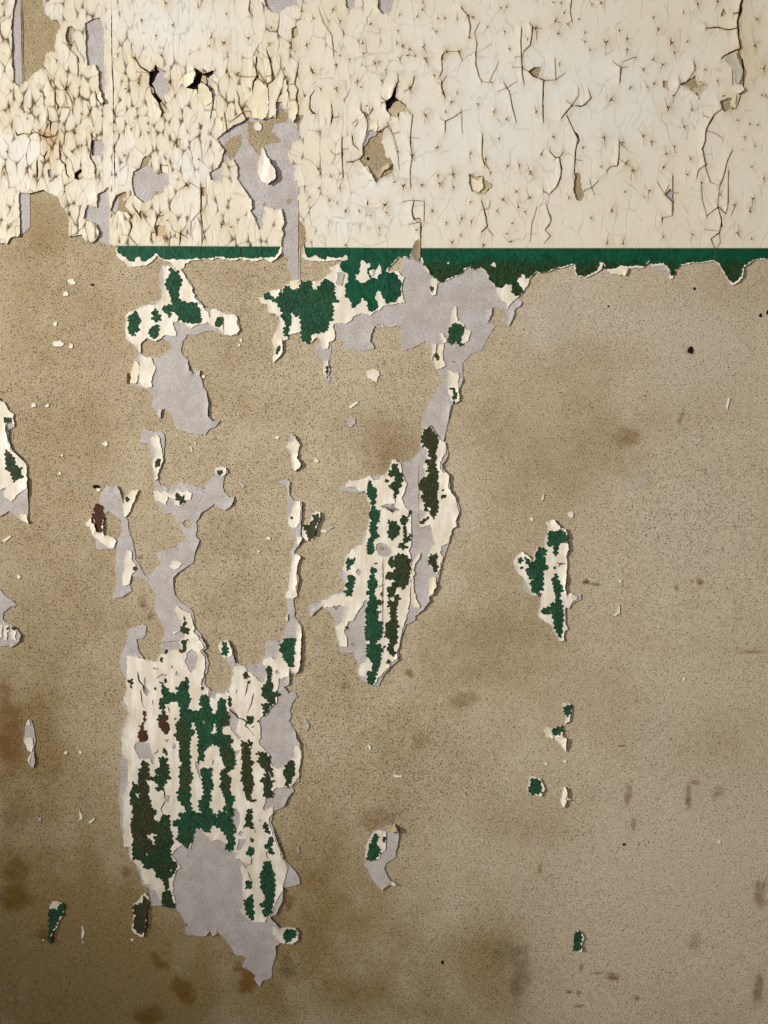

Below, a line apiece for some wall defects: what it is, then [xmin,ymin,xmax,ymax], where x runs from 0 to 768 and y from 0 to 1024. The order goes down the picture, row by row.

crack [1,1,183,194]
crack [123,158,232,245]
crack [208,0,768,248]
peeling [0,0,768,687]
peeling [85,429,334,987]
peeling [544,702,572,763]
peeling [364,824,399,890]